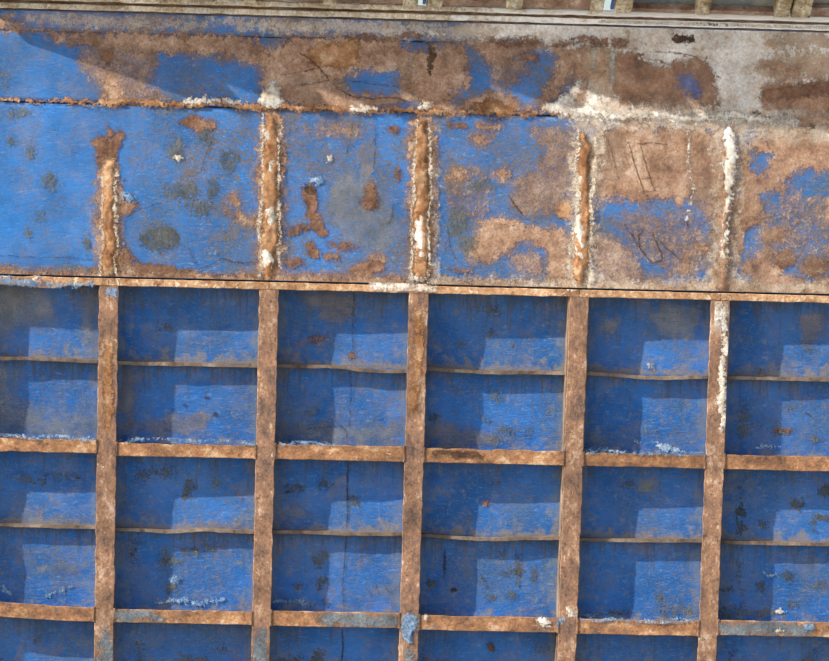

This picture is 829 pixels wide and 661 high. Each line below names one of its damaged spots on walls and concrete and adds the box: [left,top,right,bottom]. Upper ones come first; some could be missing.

corrosion [0,14,829,294]
damp [2,12,829,294]
corrosion [102,338,114,434]
corrosion [409,305,425,414]
corrosion [432,450,484,460]
damp [714,301,794,450]